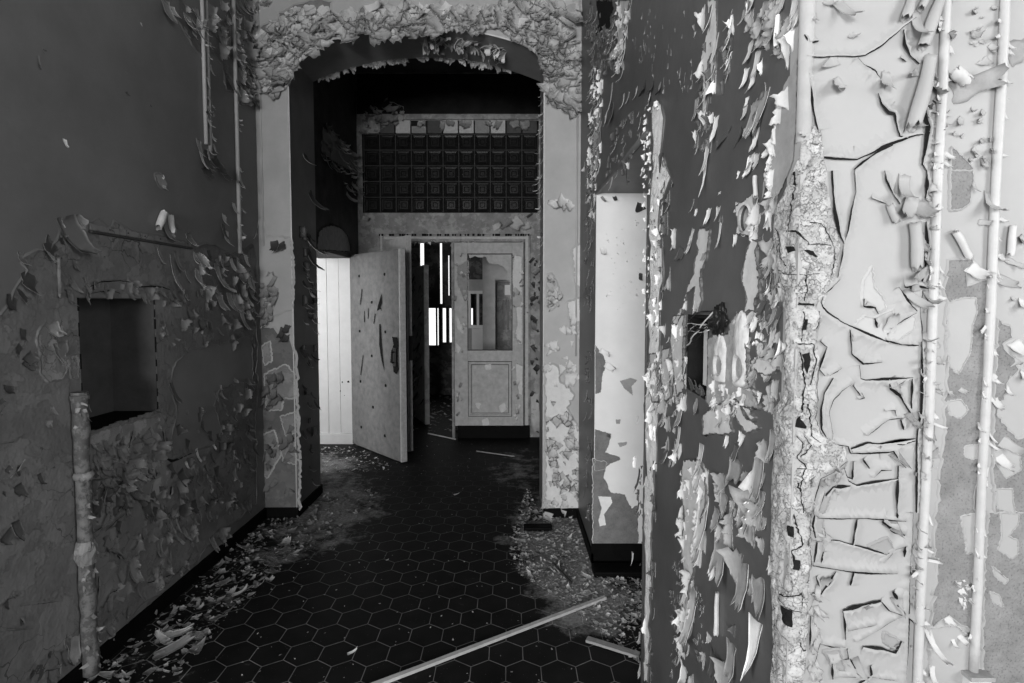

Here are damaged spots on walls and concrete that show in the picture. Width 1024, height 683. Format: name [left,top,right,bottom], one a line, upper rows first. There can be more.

flaking render [0,213,327,683]
flaking render [162,0,869,683]
crack [804,16,942,683]
flaking render [853,5,1024,683]